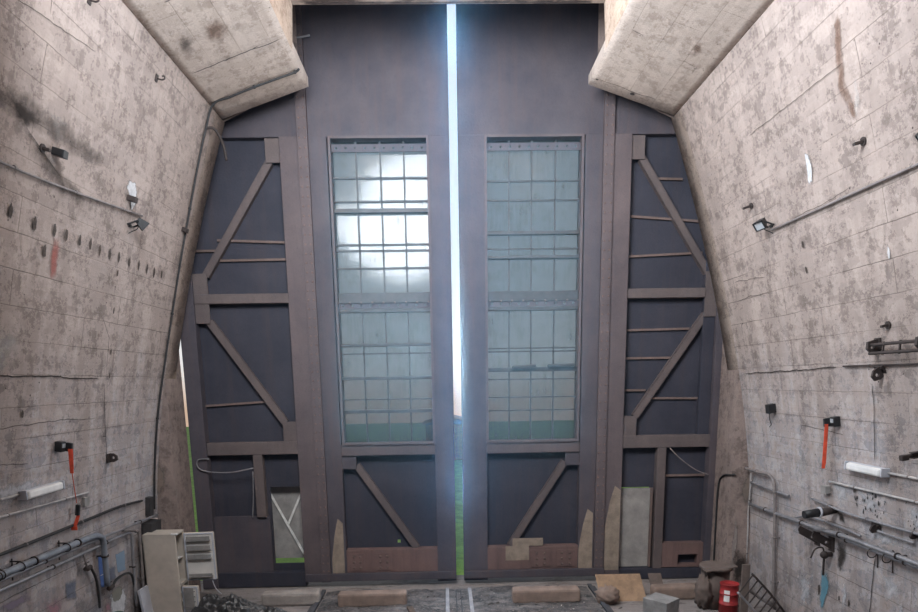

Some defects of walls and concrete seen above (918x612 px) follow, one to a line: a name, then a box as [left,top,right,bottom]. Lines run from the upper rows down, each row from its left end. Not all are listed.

corrosion [834,19,855,116]
damp [37,147,82,198]